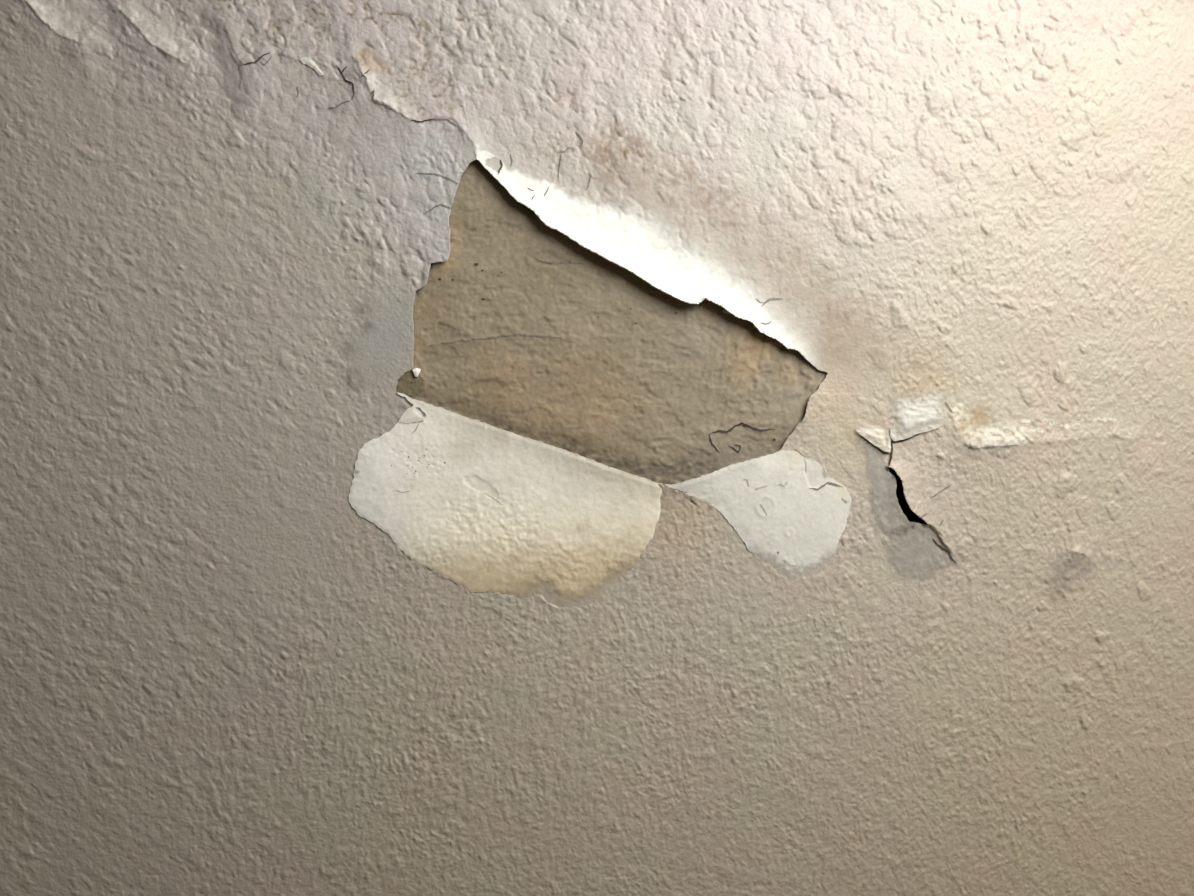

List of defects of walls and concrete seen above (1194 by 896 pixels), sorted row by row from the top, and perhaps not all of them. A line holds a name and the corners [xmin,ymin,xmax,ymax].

peeling [299,57,324,76]
peeling [349,159,852,600]
crack [888,440,995,574]
peeling [856,383,1159,579]
peeling [1048,531,1132,588]